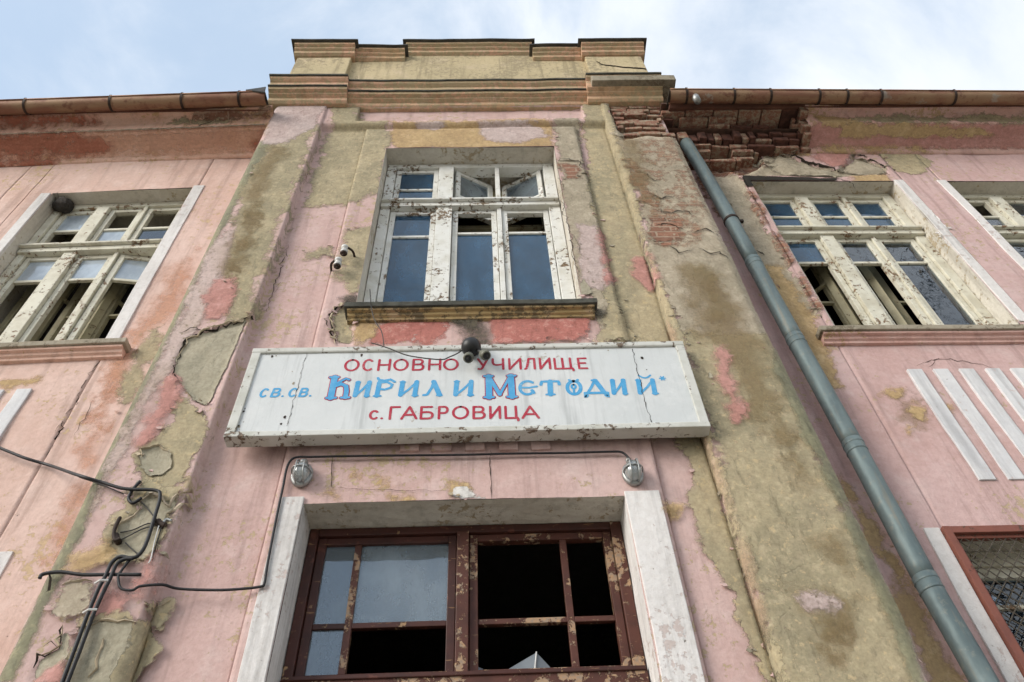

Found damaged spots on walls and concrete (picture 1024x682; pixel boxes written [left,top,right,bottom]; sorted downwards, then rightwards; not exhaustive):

crack [172,253,288,380]
peeling [34,103,933,682]
water stain [773,348,925,682]